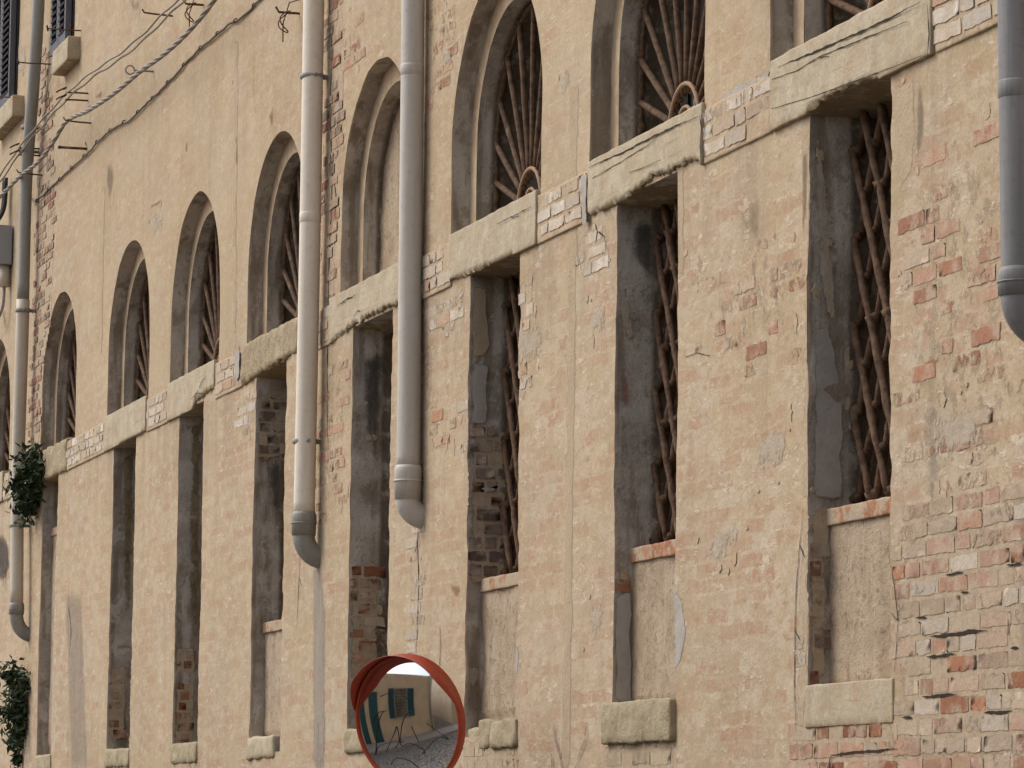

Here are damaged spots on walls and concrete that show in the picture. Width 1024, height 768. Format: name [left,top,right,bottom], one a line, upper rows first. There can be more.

crack [589,115,702,178]
flaking render [973,102,999,146]
flaking render [26,47,56,444]
water stain [366,356,382,432]
flaking render [789,167,1024,768]
flaking render [350,563,388,678]